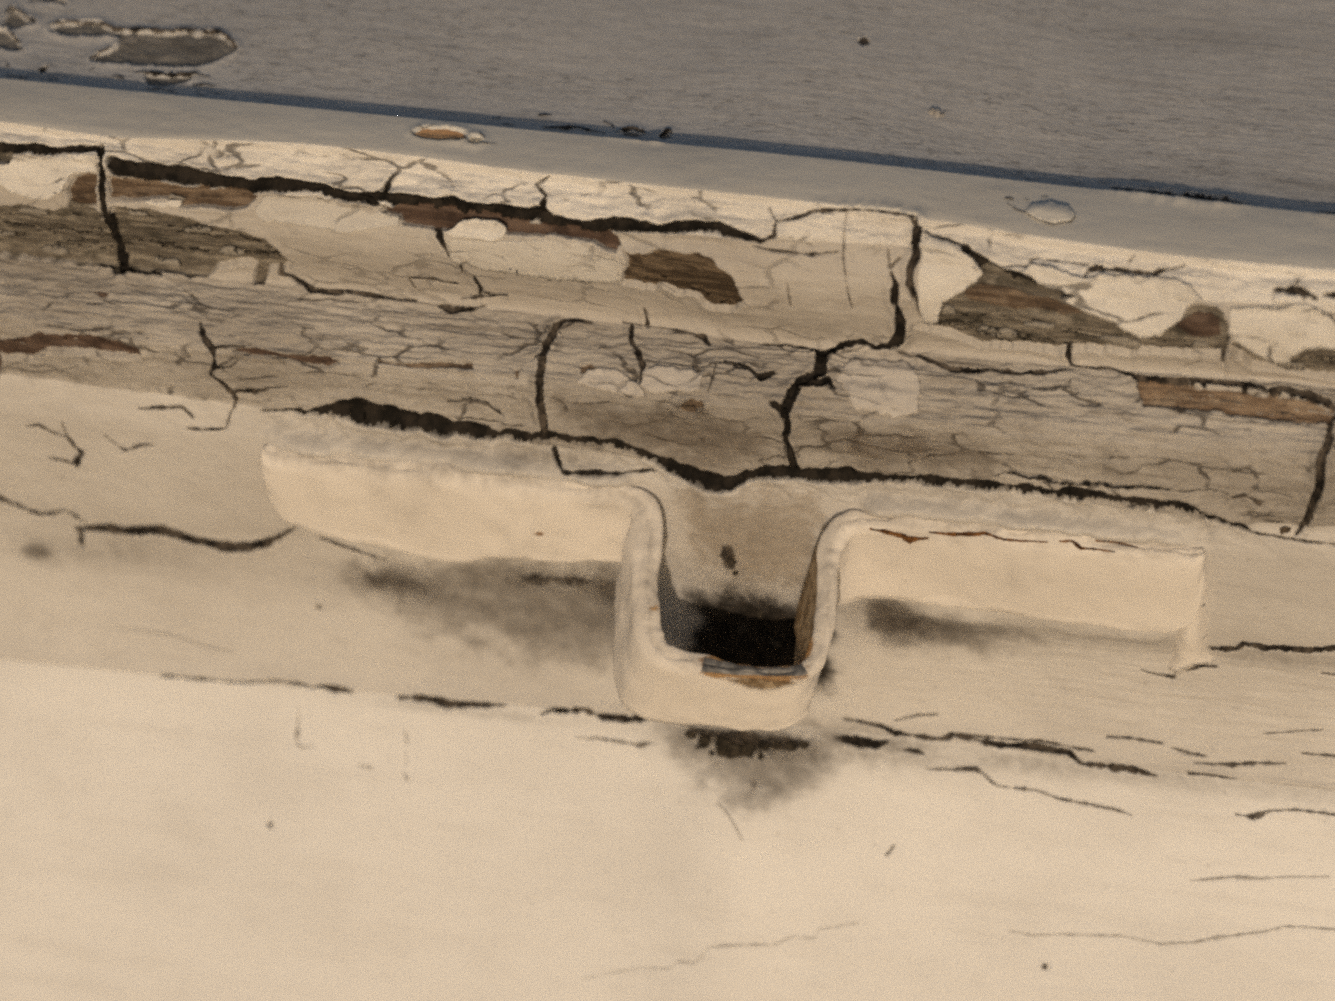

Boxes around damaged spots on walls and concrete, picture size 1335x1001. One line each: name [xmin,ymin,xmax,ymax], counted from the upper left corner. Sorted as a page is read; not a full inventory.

peeling [0,5,237,92]
peeling [0,151,743,305]
peeling [917,236,1335,372]
crack [0,142,1335,545]
peeling [1137,380,1335,427]
crack [0,495,386,561]
crack [870,528,1139,552]
crack [159,676,352,694]
crack [398,694,505,708]
crack [540,707,651,748]
crack [836,714,1335,816]
crack [1234,809,1335,819]